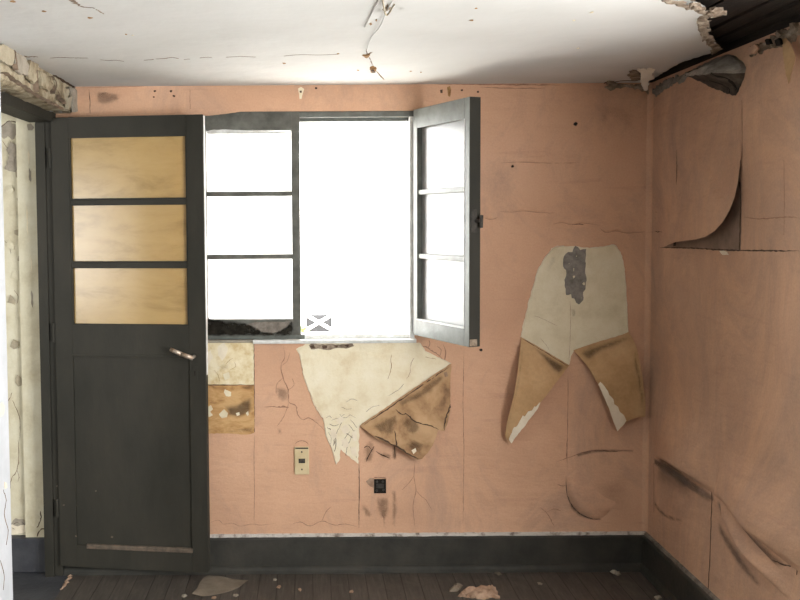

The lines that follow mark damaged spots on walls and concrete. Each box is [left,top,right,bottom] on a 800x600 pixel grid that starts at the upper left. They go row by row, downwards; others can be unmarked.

peeling [0,44,78,112]
crack [440,82,549,90]
peeling [661,0,746,96]
flaking render [521,245,628,365]
peeling [208,405,249,418]
flaking render [208,343,254,397]
crack [268,348,404,461]
flaking render [296,343,450,463]